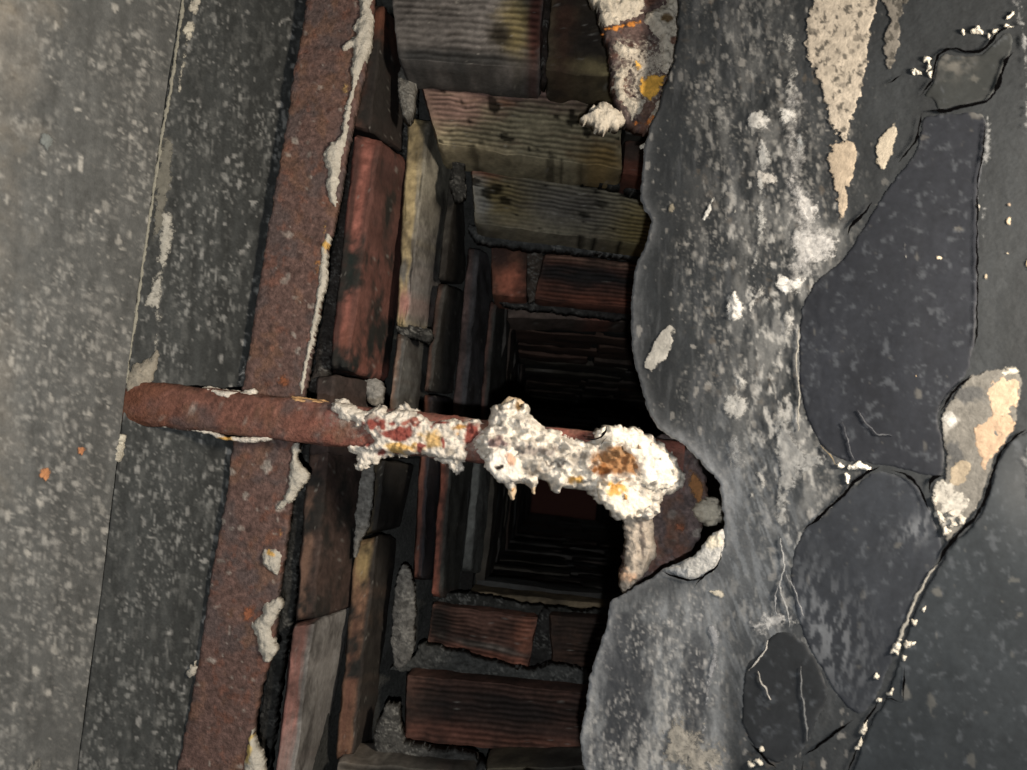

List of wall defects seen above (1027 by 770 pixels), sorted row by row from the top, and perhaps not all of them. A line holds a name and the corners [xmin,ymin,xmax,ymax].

corrosion [635,60,665,100]
flaking render [804,0,908,218]
crack [898,24,1012,163]
crack [975,130,985,342]
flaking render [645,325,675,372]
flaking render [742,33,1027,770]
crack [940,376,973,412]
corrosion [688,470,703,502]
crack [803,467,944,531]
crack [937,430,1025,565]
flaking render [665,529,725,579]
crack [802,667,905,768]